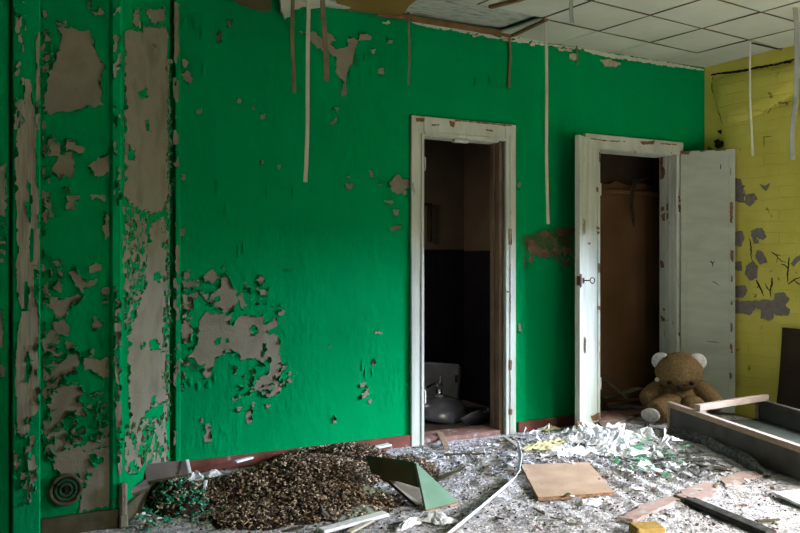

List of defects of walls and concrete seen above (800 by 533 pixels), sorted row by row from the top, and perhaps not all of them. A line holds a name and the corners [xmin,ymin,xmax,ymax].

peeling [300,31,376,96]
peeling [409,21,705,71]
peeling [369,170,410,231]
peeling [0,0,292,513]
peeling [527,219,590,268]
peeling [730,168,790,321]
crack [756,252,800,296]
peeling [358,382,372,404]